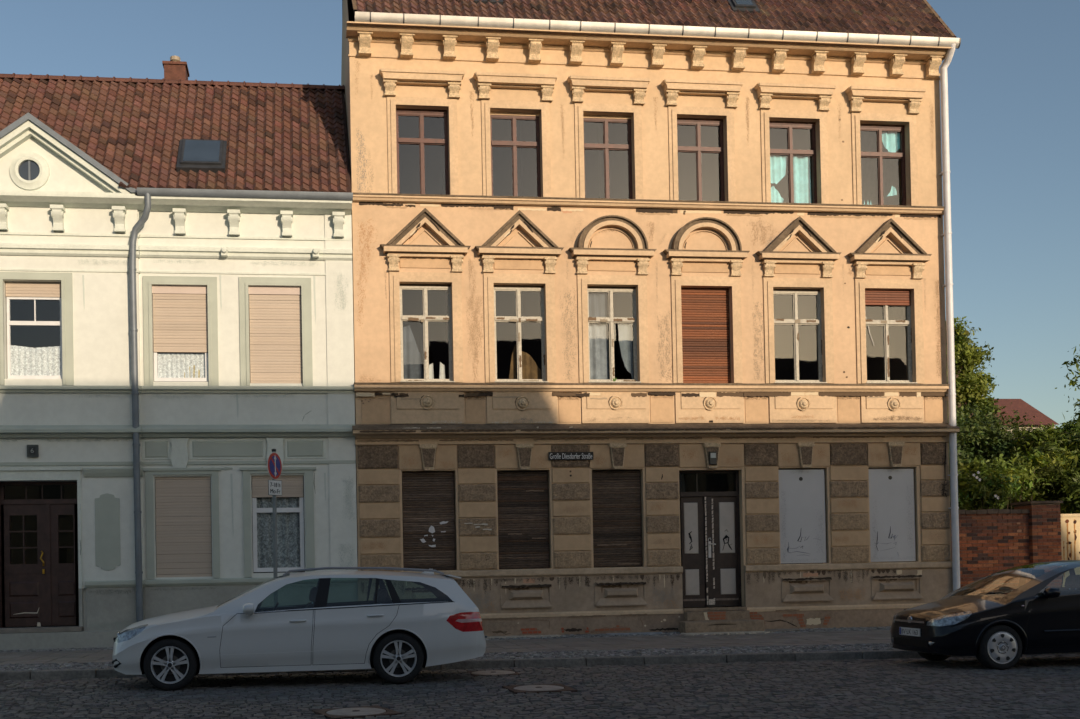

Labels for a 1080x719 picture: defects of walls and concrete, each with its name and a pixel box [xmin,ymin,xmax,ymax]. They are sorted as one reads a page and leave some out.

corrosion [1061,519,1080,577]